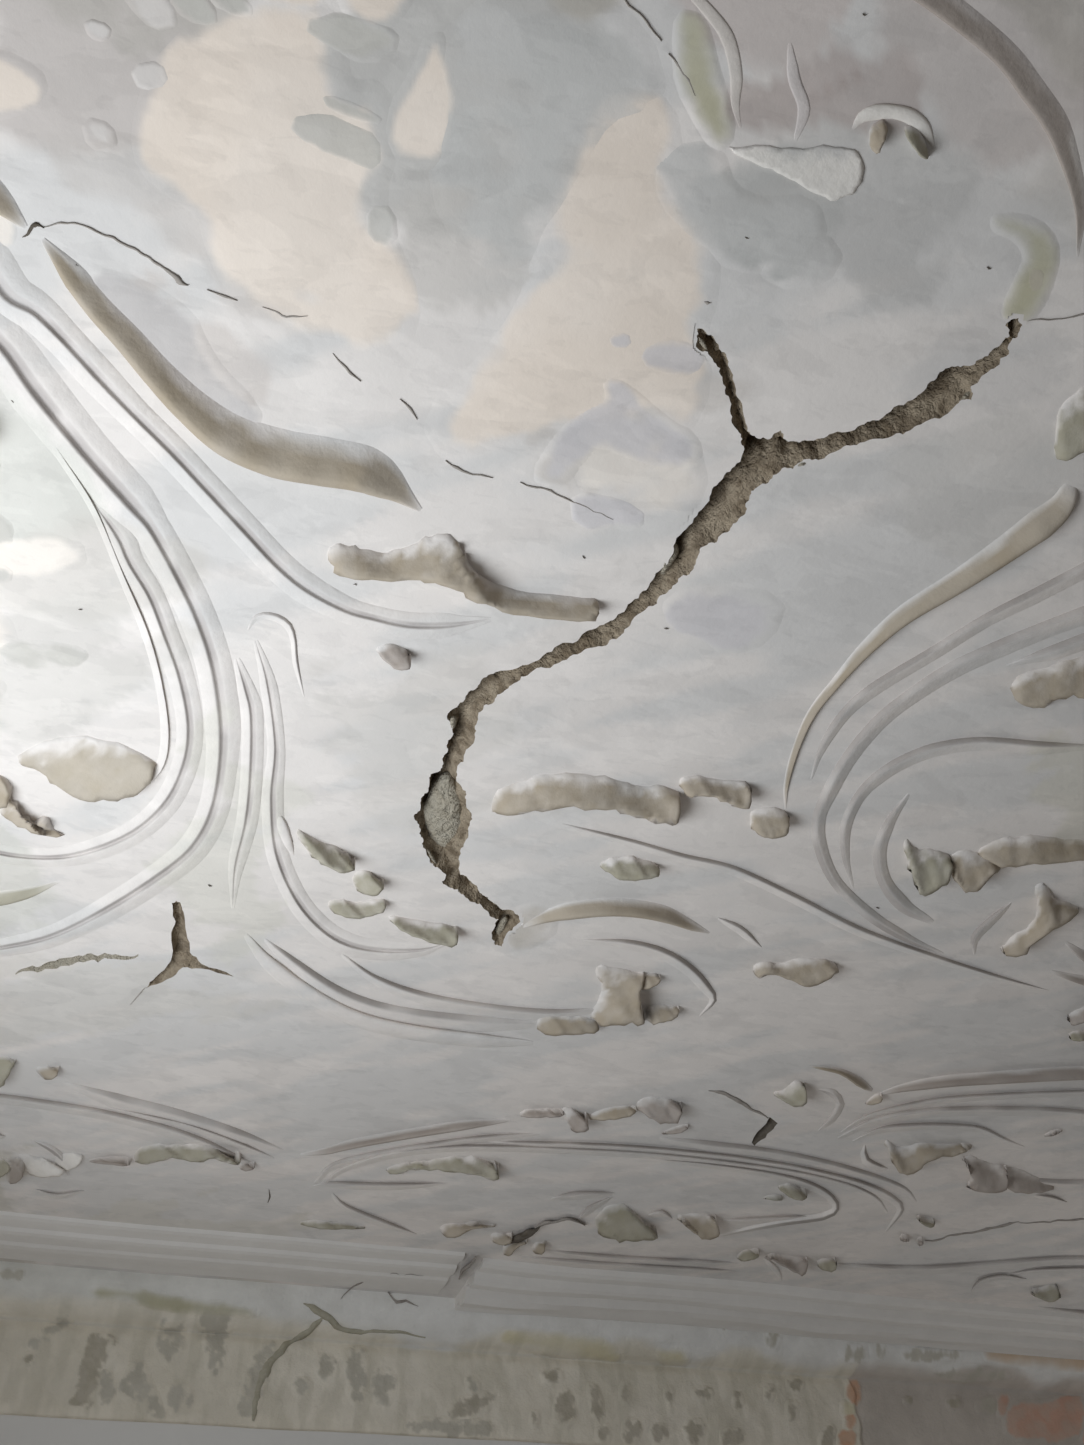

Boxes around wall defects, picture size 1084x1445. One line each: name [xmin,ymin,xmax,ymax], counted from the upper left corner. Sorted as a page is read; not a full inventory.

water stain [672,9,736,151]
crack [22,222,306,318]
crack [333,354,361,382]
peeling [424,96,843,537]
water stain [990,212,1060,325]
crack [414,313,1084,946]
crack [710,1091,778,1146]
crack [459,1218,585,1280]
water stain [20,1282,257,1423]
crack [252,1273,425,1421]
water stain [404,1374,499,1440]
water stain [498,1326,746,1445]